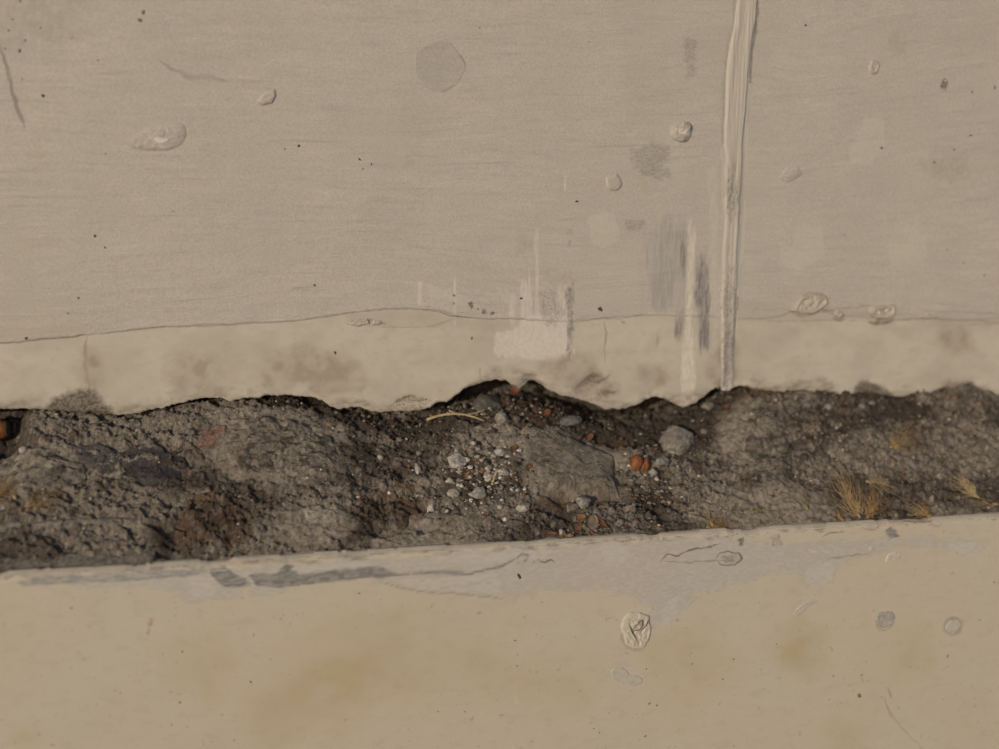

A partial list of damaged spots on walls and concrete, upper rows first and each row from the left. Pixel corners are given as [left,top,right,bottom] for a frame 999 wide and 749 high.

damp [622,83,752,407]